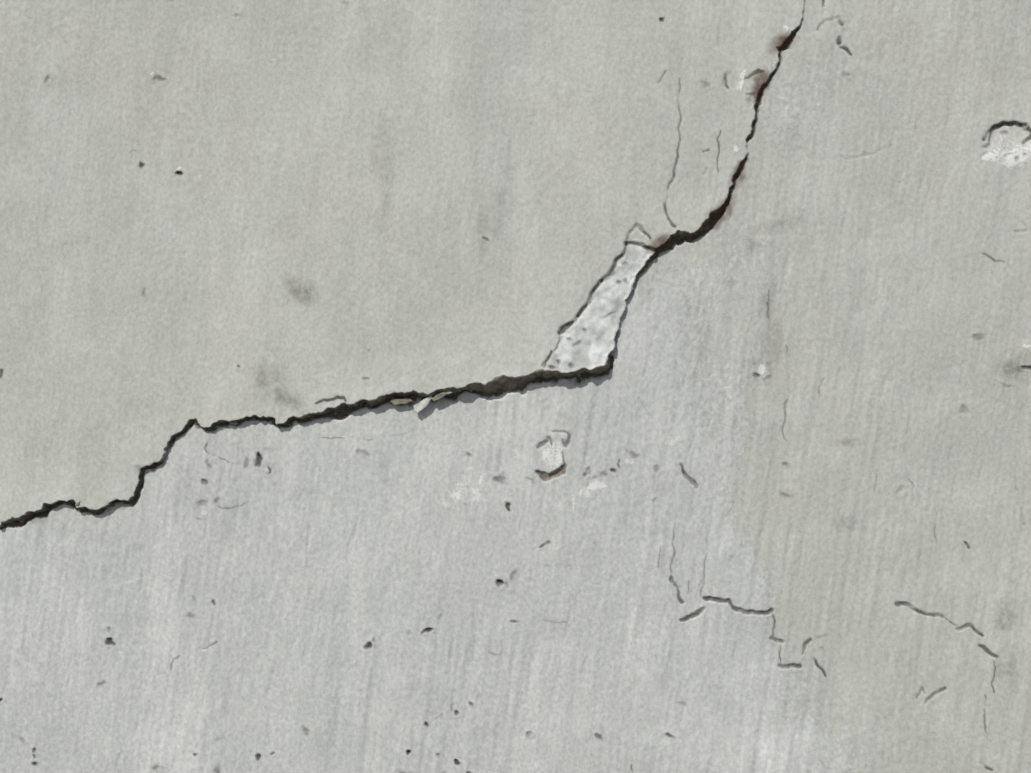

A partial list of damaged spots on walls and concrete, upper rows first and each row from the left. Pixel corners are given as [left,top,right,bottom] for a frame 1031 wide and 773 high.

crack [638,0,852,274]
spalling [980,122,1031,170]
crack [0,356,613,529]
flaking render [0,201,894,773]
crack [680,597,775,622]
crack [790,639,826,677]
crack [967,625,998,657]